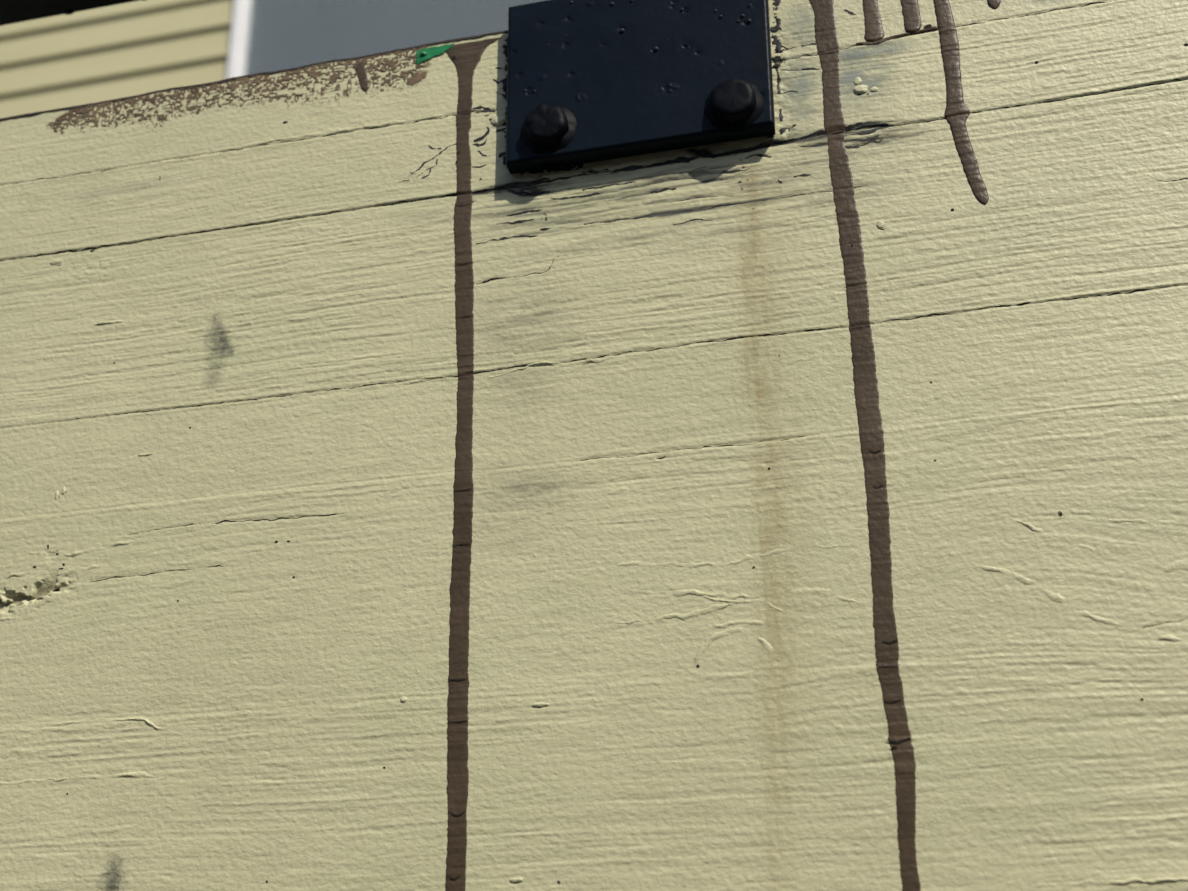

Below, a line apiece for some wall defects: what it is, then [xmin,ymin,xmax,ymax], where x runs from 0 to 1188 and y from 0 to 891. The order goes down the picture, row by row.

peeling [406,71,427,85]